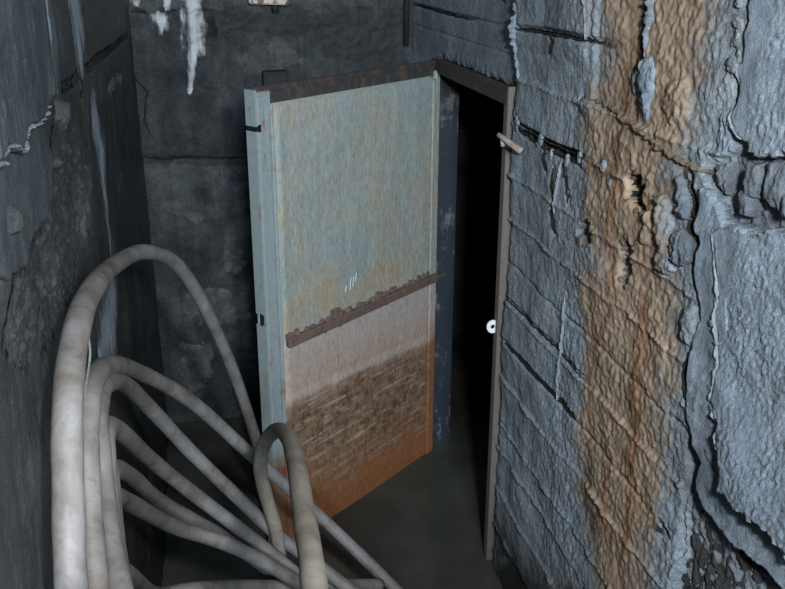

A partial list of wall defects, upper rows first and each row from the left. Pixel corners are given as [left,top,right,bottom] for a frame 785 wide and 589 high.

leakage [152,0,171,33]
leakage [179,0,401,95]
leakage [630,56,656,121]
crack [684,167,700,283]
rust [576,0,707,589]
crack [681,358,689,401]